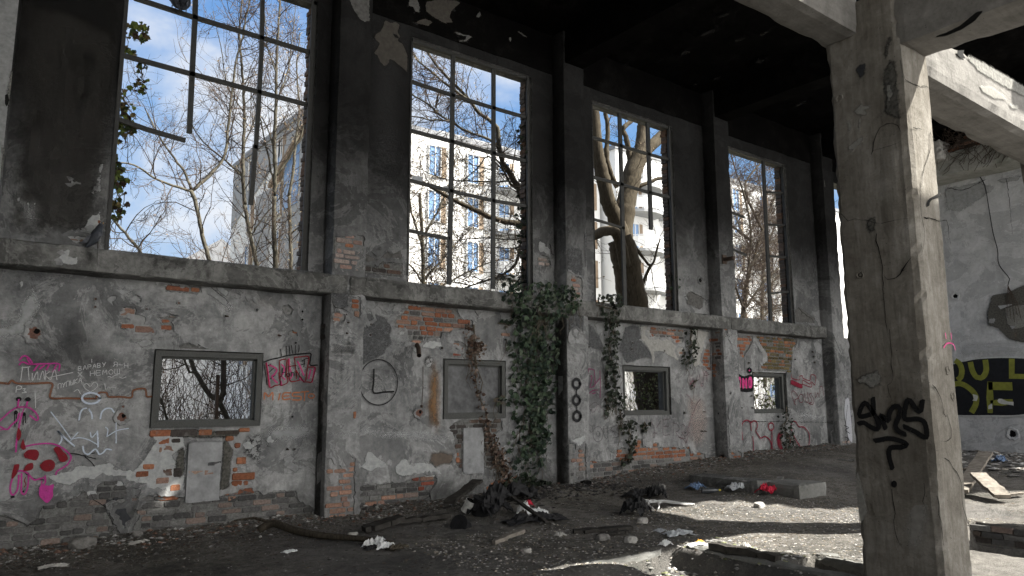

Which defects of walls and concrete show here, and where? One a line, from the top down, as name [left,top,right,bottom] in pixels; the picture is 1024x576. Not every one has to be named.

flaking render [374,20,408,72]
spalling [883,37,900,118]
flaking render [320,294,478,367]
flaking render [567,248,822,380]
crack [835,123,950,400]
flaking render [0,418,529,549]